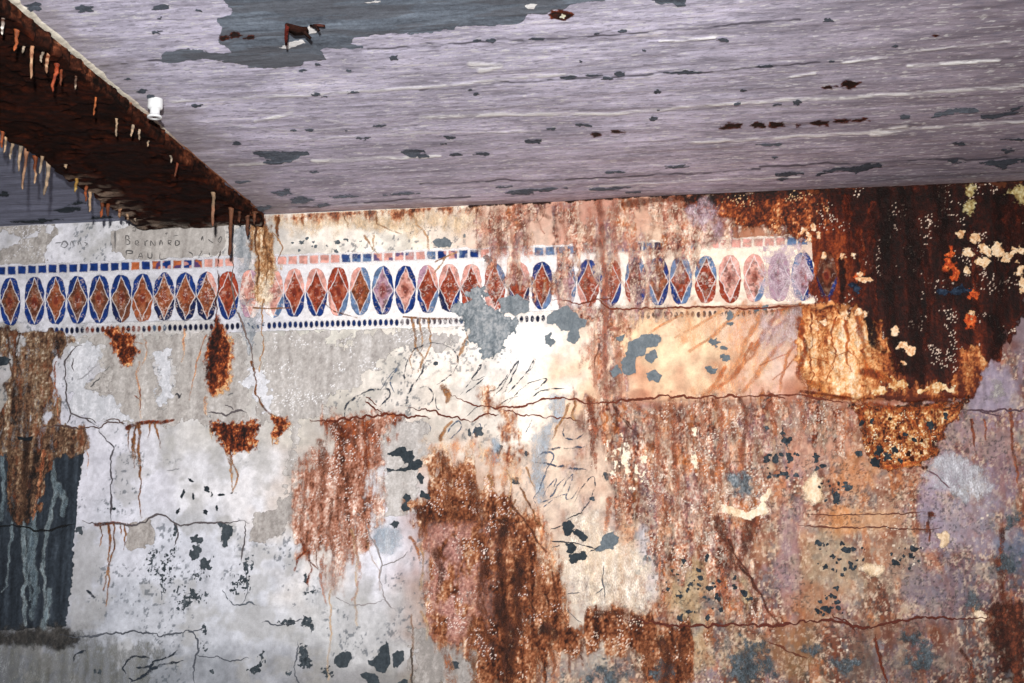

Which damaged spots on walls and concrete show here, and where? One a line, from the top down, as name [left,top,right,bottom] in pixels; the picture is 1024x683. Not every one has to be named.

peeling [159,0,605,72]
rust [0,325,90,525]
leakage [0,451,164,683]
rust [103,326,174,514]
crack [0,345,304,683]
peeling [65,286,530,543]
rust [403,385,710,683]
peeling [545,306,587,347]
crack [310,389,866,422]
rust [182,180,1024,636]
crack [551,512,999,683]
spalling [848,395,970,472]